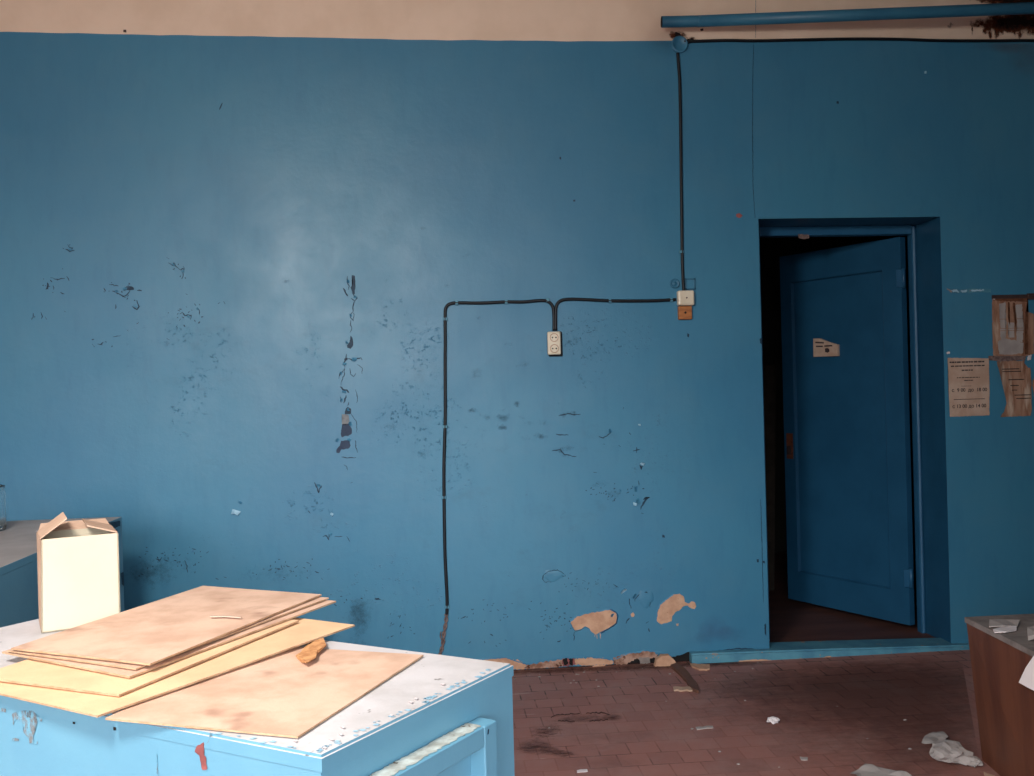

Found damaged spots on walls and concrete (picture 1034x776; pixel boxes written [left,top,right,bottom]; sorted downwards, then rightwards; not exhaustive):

leakage [970,0,1034,39]
peeling [335,275,363,470]
flaking render [530,572,639,642]
flaking render [648,594,696,632]
flaking render [478,650,689,671]